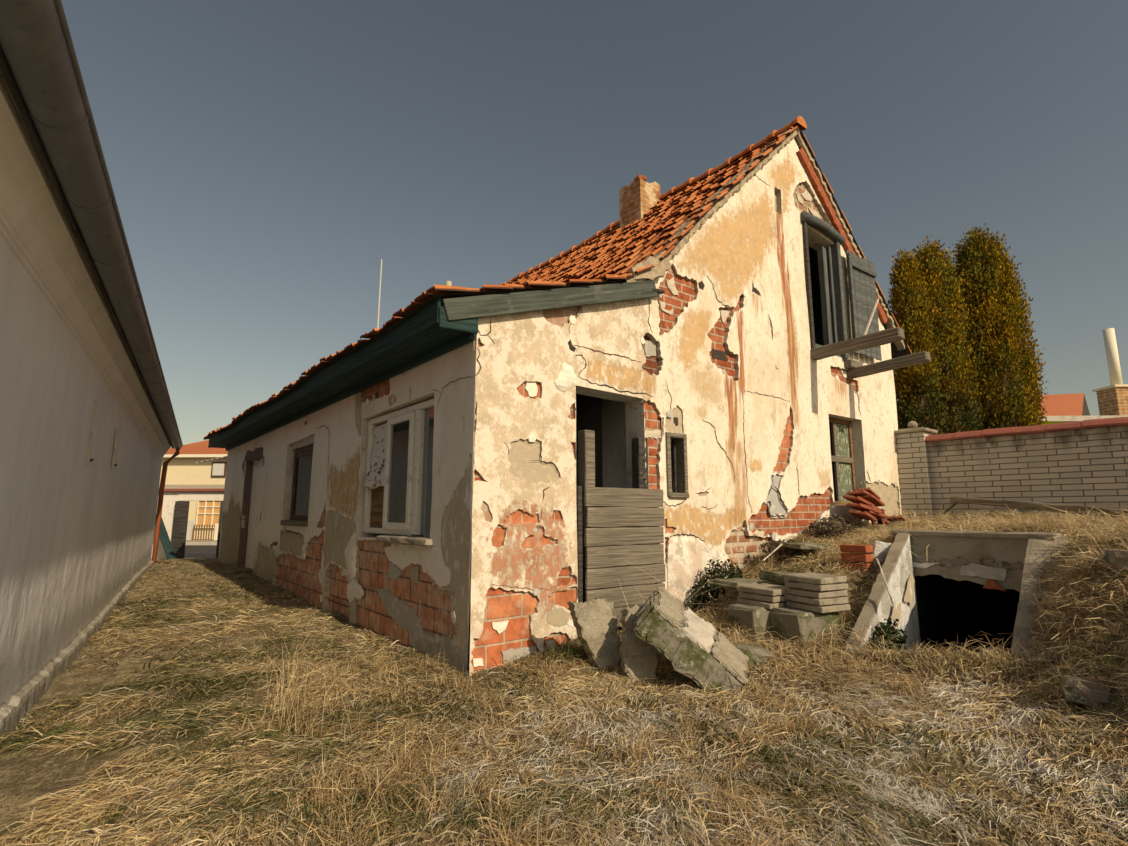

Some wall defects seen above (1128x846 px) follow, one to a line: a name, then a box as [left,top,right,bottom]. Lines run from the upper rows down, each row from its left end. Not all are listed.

flaking render [274,379,576,674]
crack [569,308,672,416]
peeling [587,358,678,489]
peeling [657,160,834,417]
flaking render [664,414,831,570]
crack [703,390,800,510]